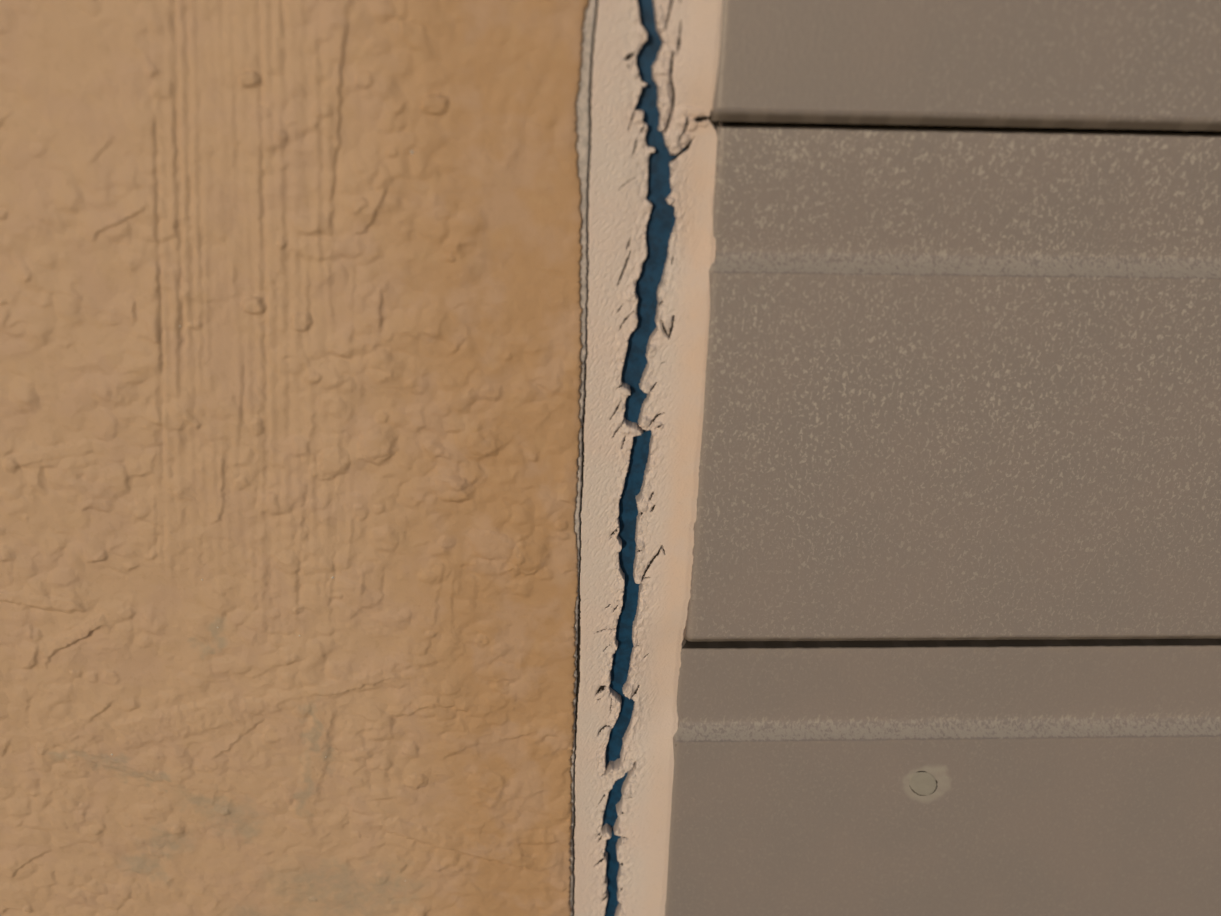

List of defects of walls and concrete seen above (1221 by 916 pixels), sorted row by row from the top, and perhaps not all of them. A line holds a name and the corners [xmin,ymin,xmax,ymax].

crack [572,0,720,916]